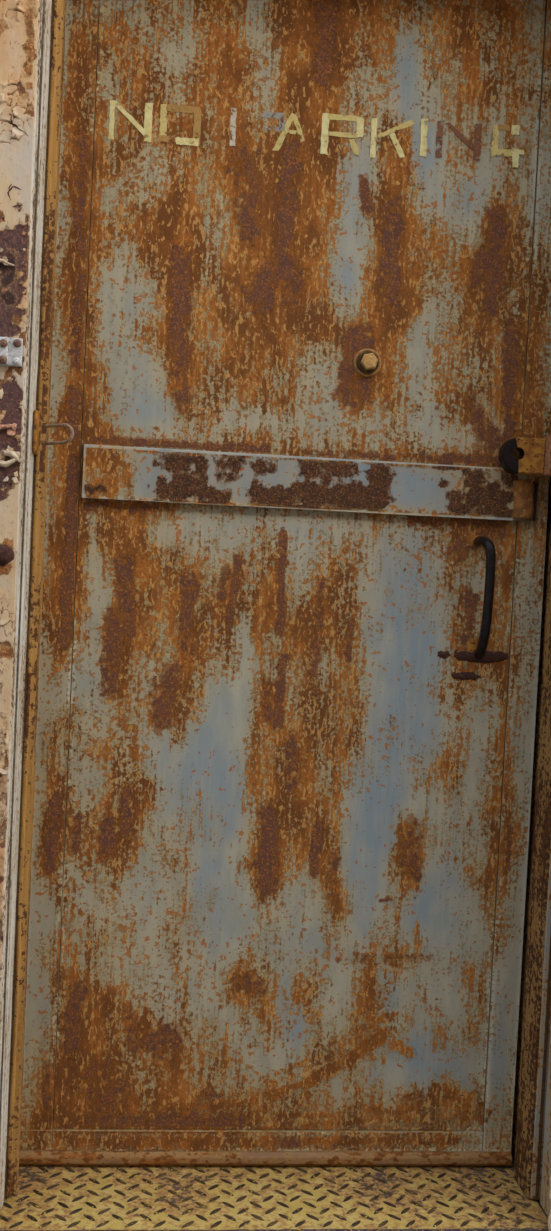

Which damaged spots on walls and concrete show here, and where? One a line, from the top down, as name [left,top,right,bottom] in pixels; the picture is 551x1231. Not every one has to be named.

rust [0,357,24,501]
rust [0,538,17,575]
rust [0,642,13,693]
rust [0,712,9,847]
rust [143,805,195,884]